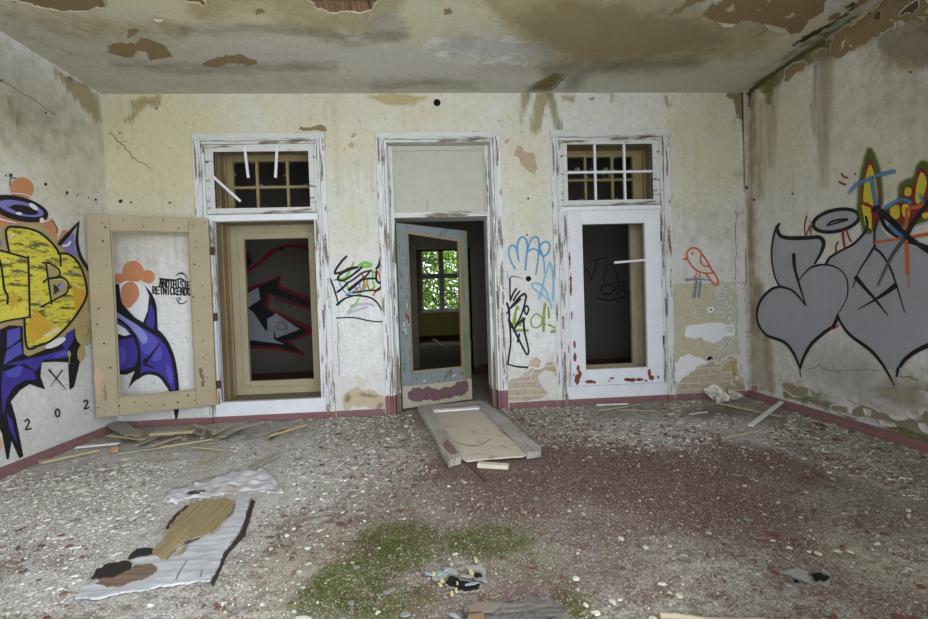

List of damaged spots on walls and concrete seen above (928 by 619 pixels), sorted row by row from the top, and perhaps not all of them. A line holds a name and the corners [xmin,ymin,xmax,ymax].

spalling [1,0,106,14]
spalling [307,0,379,14]
peeling [107,28,173,60]
damp [726,2,860,119]
peeling [669,0,928,83]
peeling [504,138,539,178]
peeling [556,243,572,300]
spalling [496,263,596,405]
spalling [609,281,759,396]
spalling [340,374,386,411]